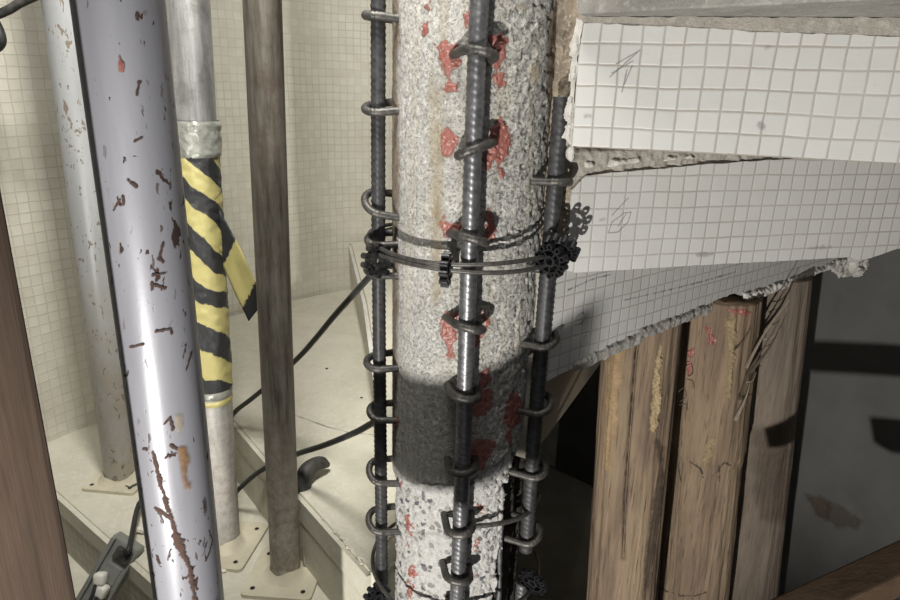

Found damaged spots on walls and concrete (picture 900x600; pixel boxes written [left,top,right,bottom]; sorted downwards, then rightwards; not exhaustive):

spalling [569,33,580,83]
spalling [562,95,786,185]
spalling [742,257,869,301]
spalling [573,303,713,371]
water stain [502,388,523,447]